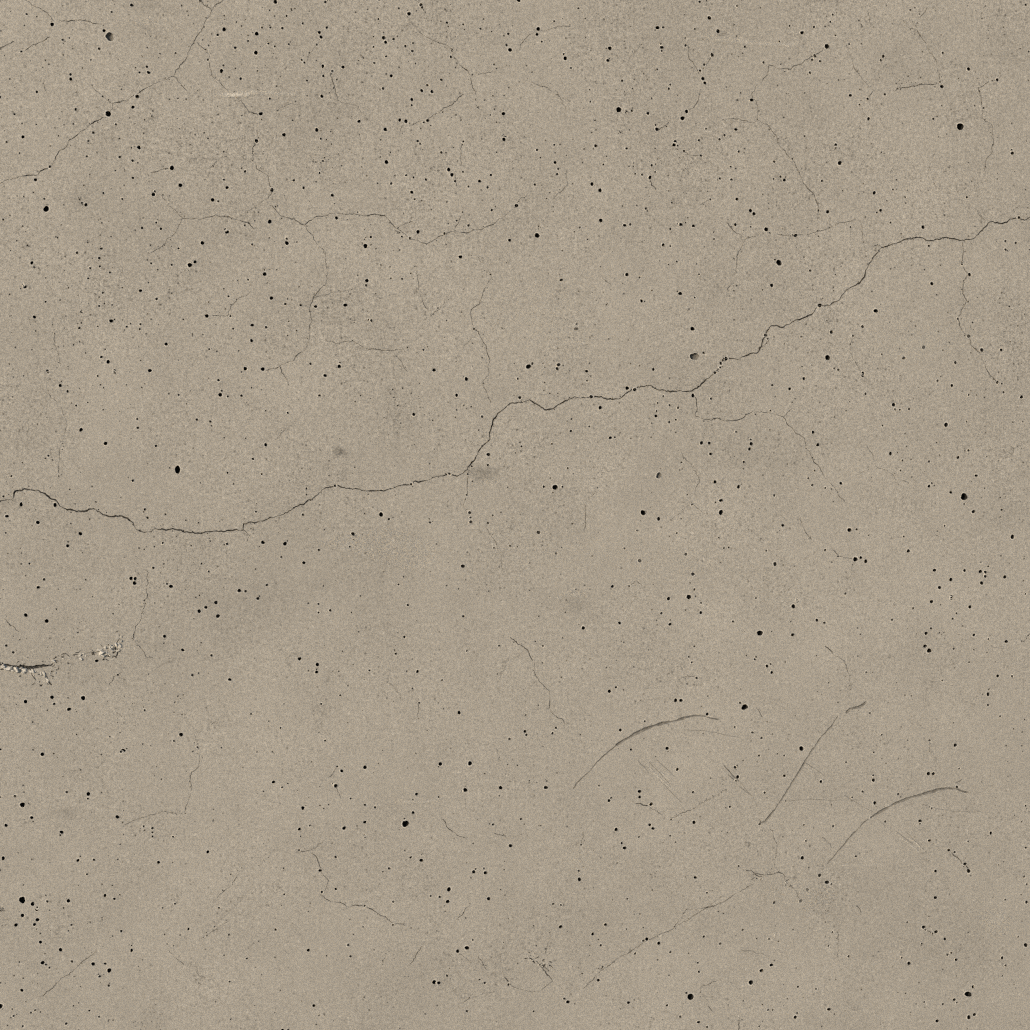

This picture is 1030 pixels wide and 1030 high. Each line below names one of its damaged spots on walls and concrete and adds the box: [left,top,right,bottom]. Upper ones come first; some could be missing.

crack [0,0,1030,541]
spalling [0,631,122,687]